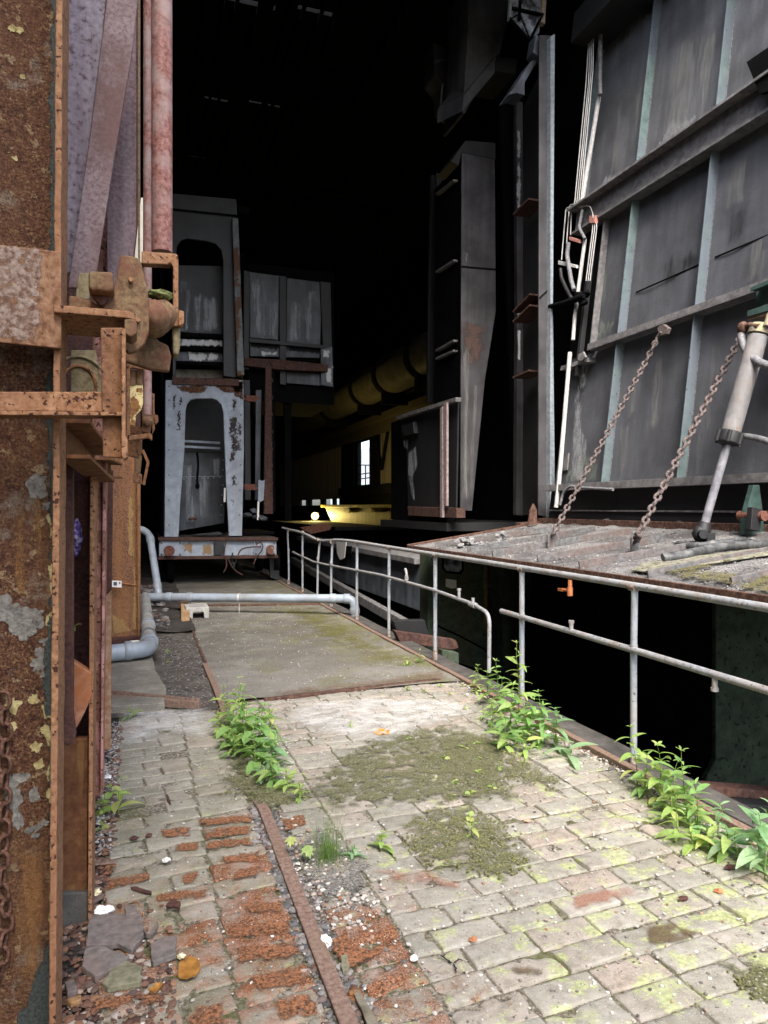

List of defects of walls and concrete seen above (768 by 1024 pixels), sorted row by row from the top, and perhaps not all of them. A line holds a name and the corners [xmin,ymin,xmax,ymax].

corrosion [177,380,245,400]
corrosion [112,495,137,634]
peeling [0,593,52,678]
corrosion [24,855,42,970]